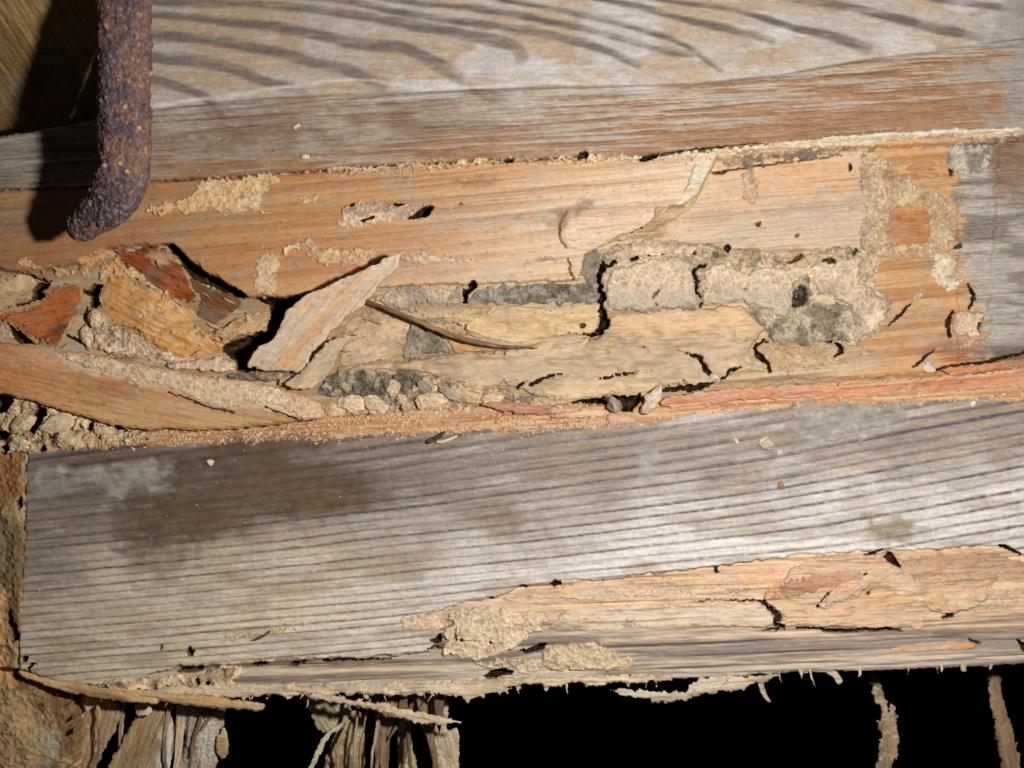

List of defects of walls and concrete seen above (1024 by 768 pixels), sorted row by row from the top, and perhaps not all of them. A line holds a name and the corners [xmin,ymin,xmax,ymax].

rust [66,0,154,243]
peeling [0,274,83,349]
spalling [163,243,313,373]
spalling [792,285,808,308]
peeling [640,385,662,414]
peeling [818,567,904,609]
crack [691,598,785,632]
peeling [426,681,512,703]